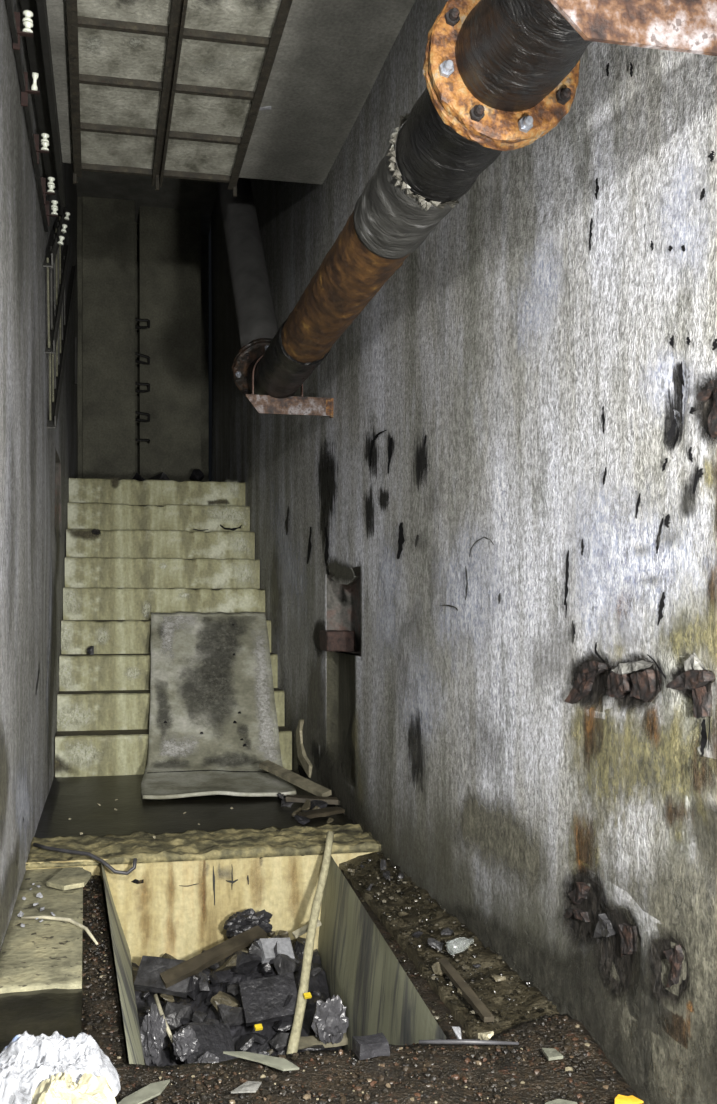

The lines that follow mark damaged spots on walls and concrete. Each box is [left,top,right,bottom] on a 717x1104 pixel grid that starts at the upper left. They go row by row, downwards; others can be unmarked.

rust [705,449,717,543]
rust [667,562,717,664]